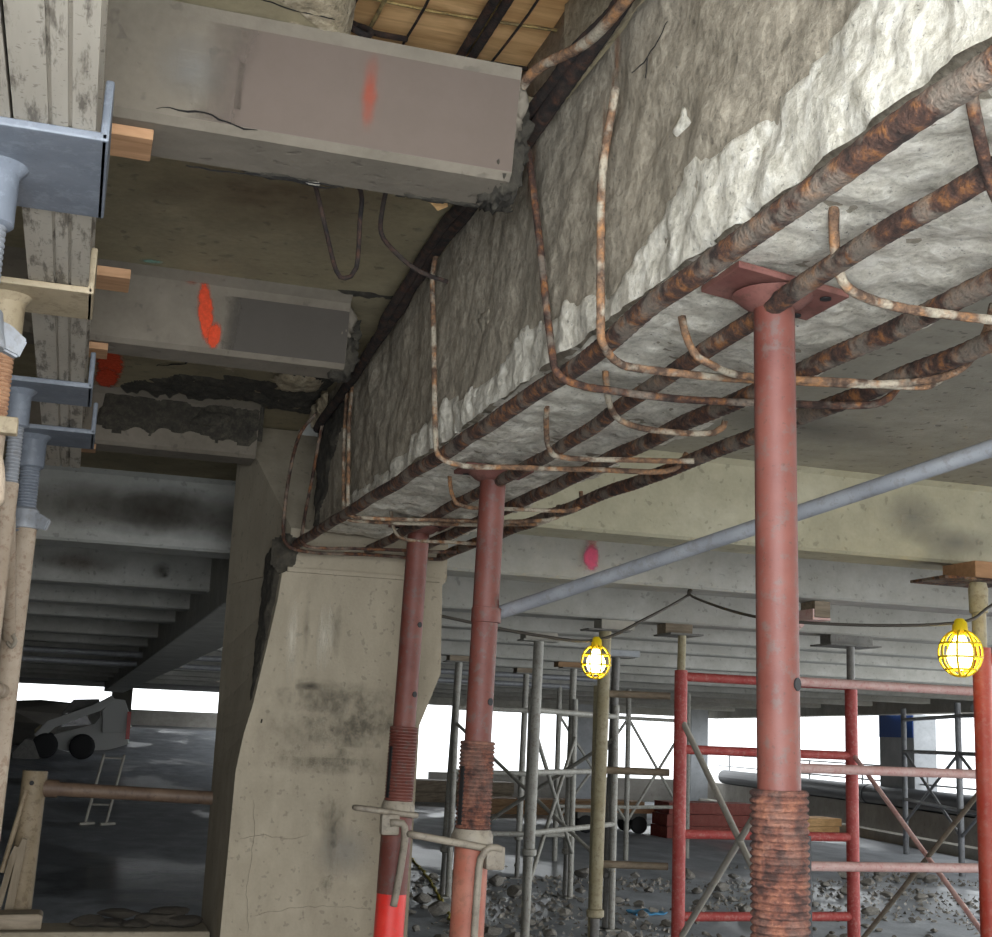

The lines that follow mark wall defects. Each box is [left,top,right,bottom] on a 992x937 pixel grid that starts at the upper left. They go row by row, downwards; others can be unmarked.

spalling [278,0,356,34]
crack [156,107,256,130]
spalling [186,165,344,189]
spalling [328,0,992,541]
spalling [96,290,393,527]